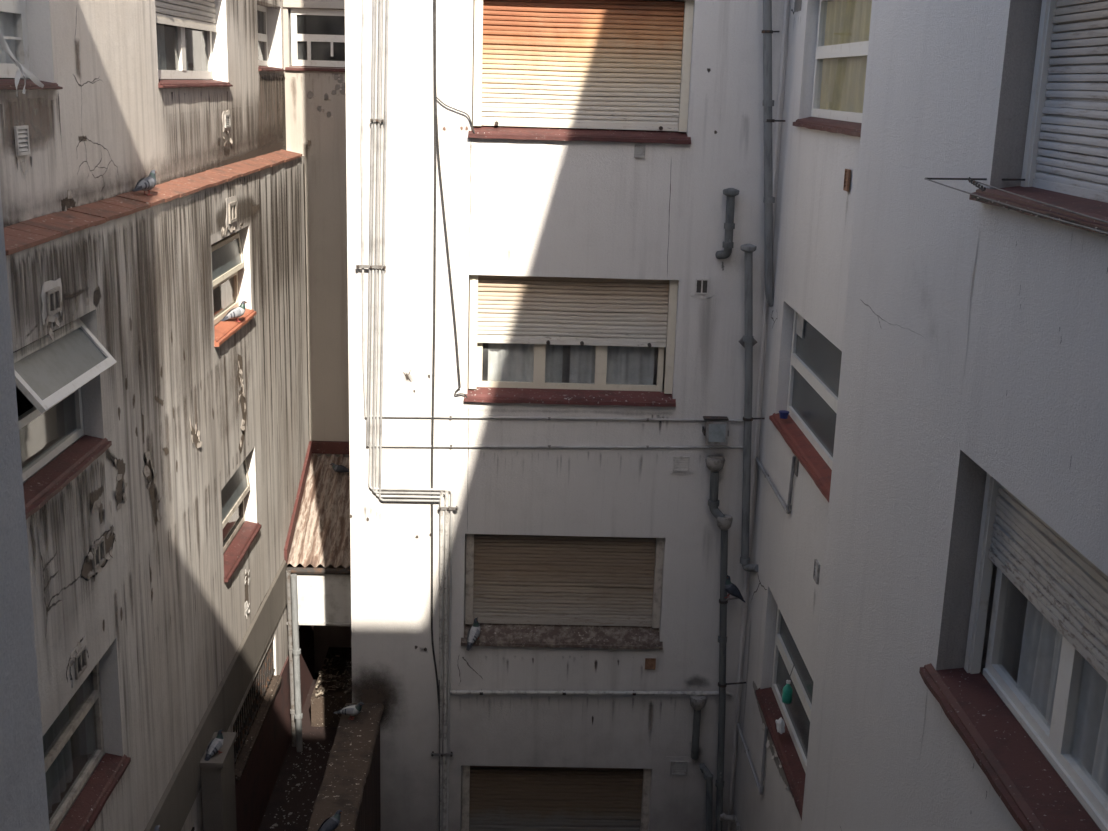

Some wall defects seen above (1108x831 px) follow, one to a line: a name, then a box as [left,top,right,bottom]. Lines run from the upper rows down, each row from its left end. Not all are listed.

leakage [0,96,61,170]
crack [74,11,119,192]
leakage [156,74,295,185]
leakage [11,140,311,398]
flaking render [81,449,128,581]
peeling [125,378,162,525]